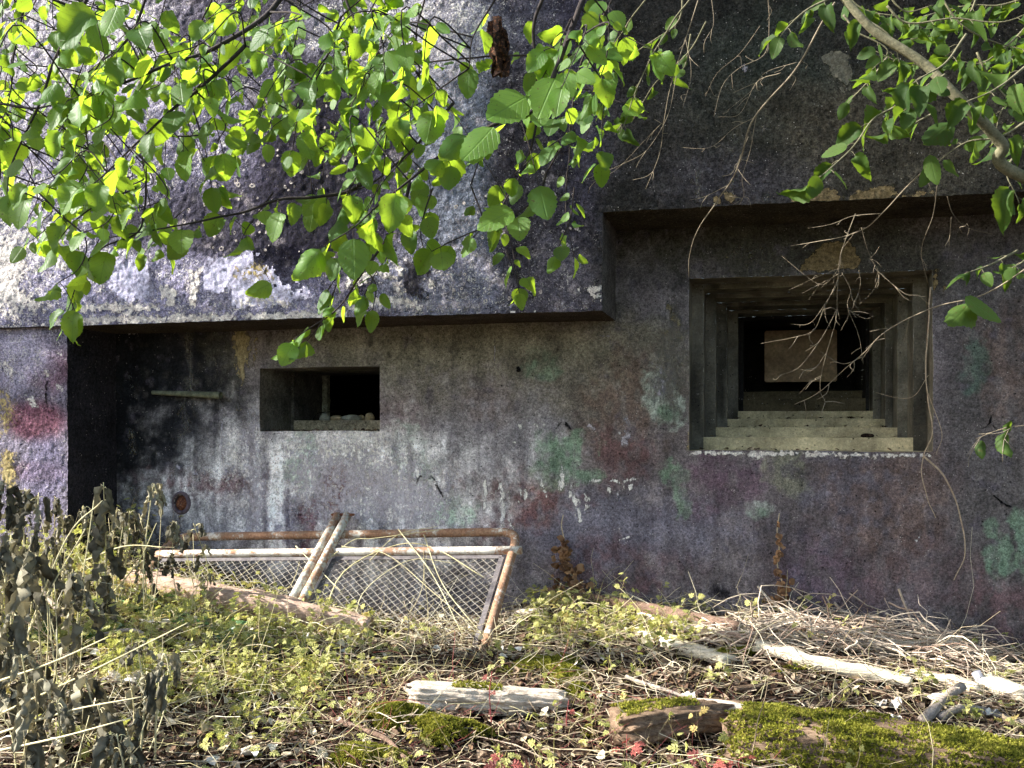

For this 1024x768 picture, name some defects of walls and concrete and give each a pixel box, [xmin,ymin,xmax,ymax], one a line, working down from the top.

spalling [791,185,934,202]
spalling [800,240,861,273]